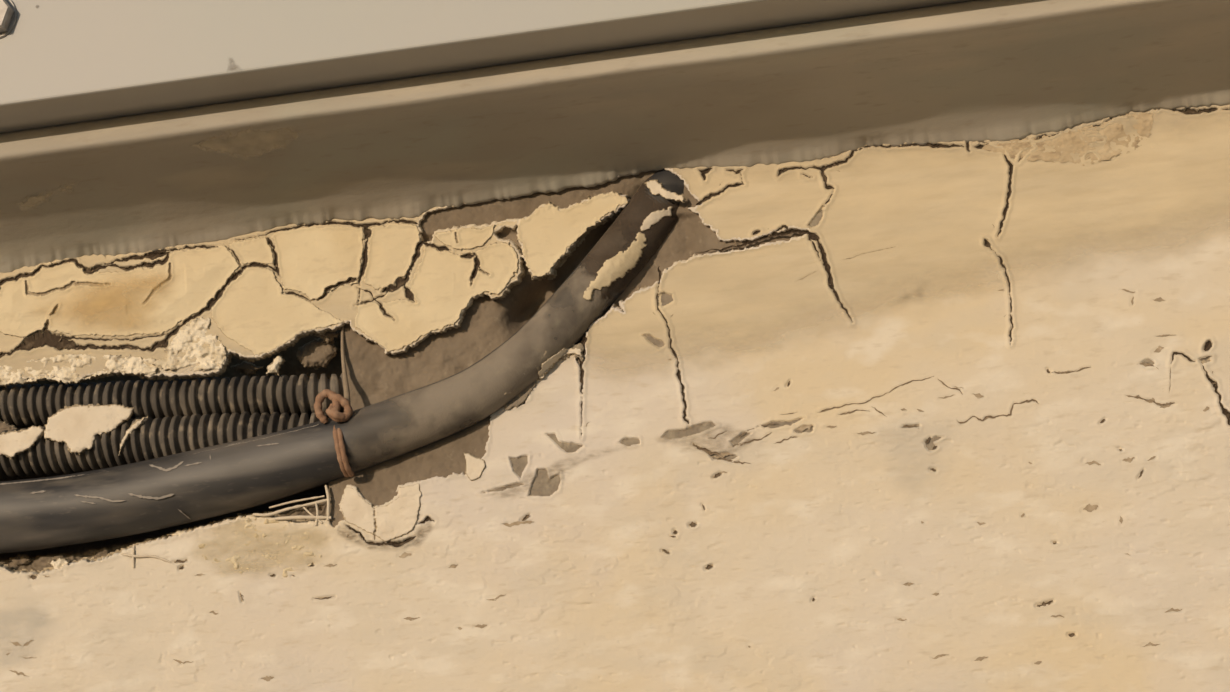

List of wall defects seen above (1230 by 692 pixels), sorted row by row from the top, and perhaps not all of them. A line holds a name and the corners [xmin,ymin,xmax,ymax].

crack [696,168,743,205]
crack [0,219,485,358]
flaking render [0,171,823,411]
crack [697,225,896,321]
crack [778,133,1058,345]
flaking render [0,416,491,579]
peeling [484,456,560,496]
peeling [547,434,583,453]
peeling [663,422,750,478]
peeling [763,418,836,433]
crack [653,266,1038,464]
crack [1129,341,1230,425]